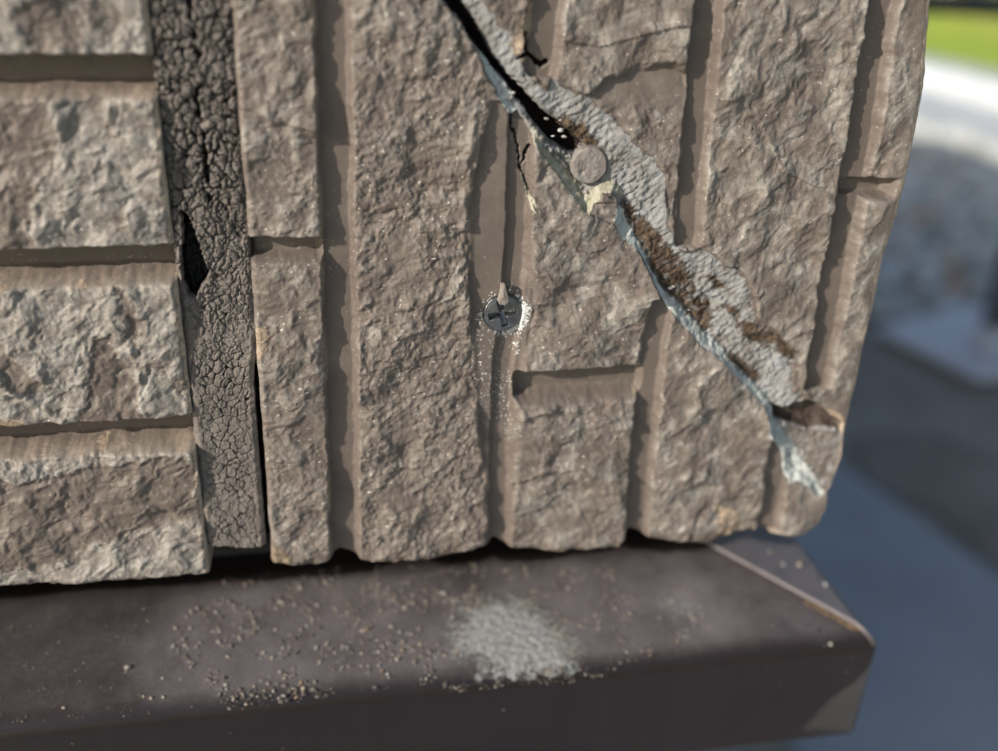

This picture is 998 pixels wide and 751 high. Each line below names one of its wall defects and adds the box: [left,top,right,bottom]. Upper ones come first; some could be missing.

crack [149,0,258,547]
peeling [497,282,509,305]
peeling [509,0,533,55]
crack [442,0,837,497]